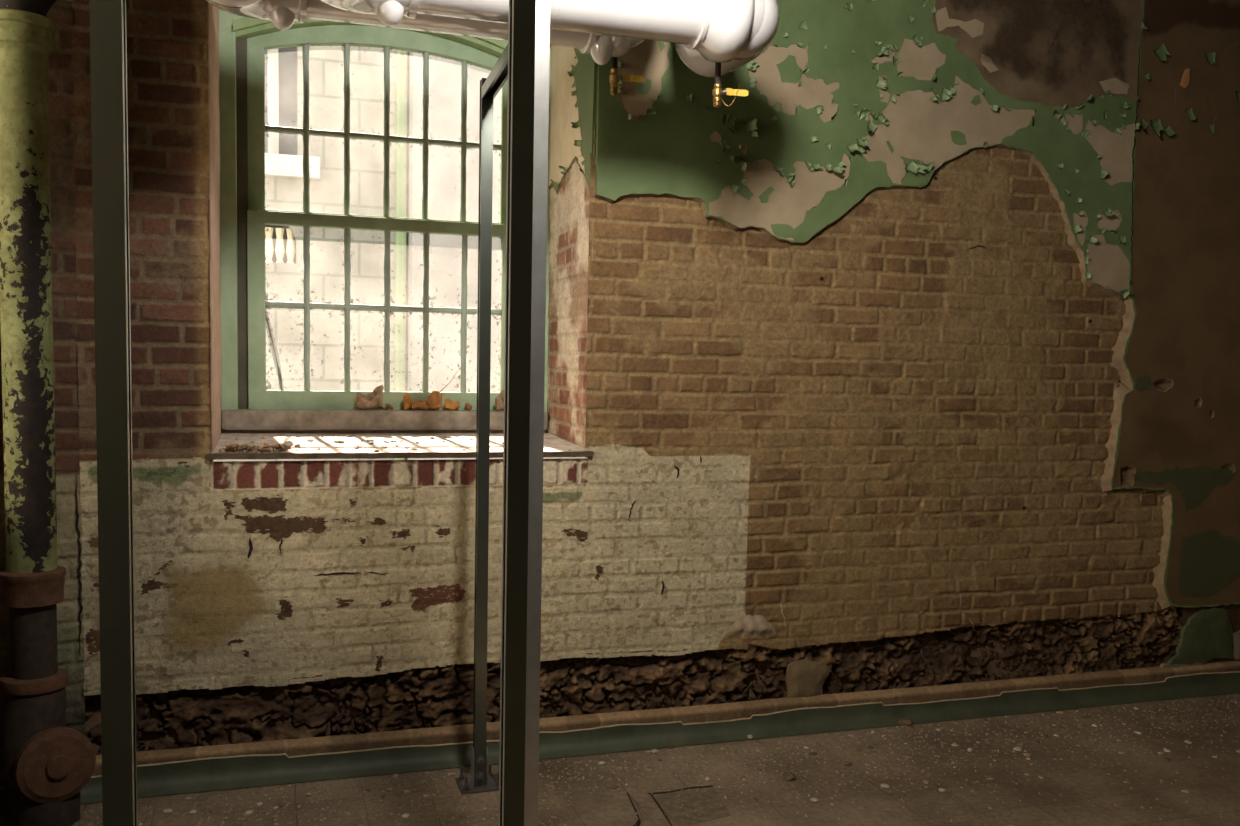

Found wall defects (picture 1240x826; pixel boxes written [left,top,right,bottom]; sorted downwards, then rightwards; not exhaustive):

leakage [954,0,1125,84]
flaking render [539,0,1240,733]
peeling [222,495,415,551]
peeling [275,597,293,620]
peeling [406,582,465,612]
spalling [136,656,501,767]